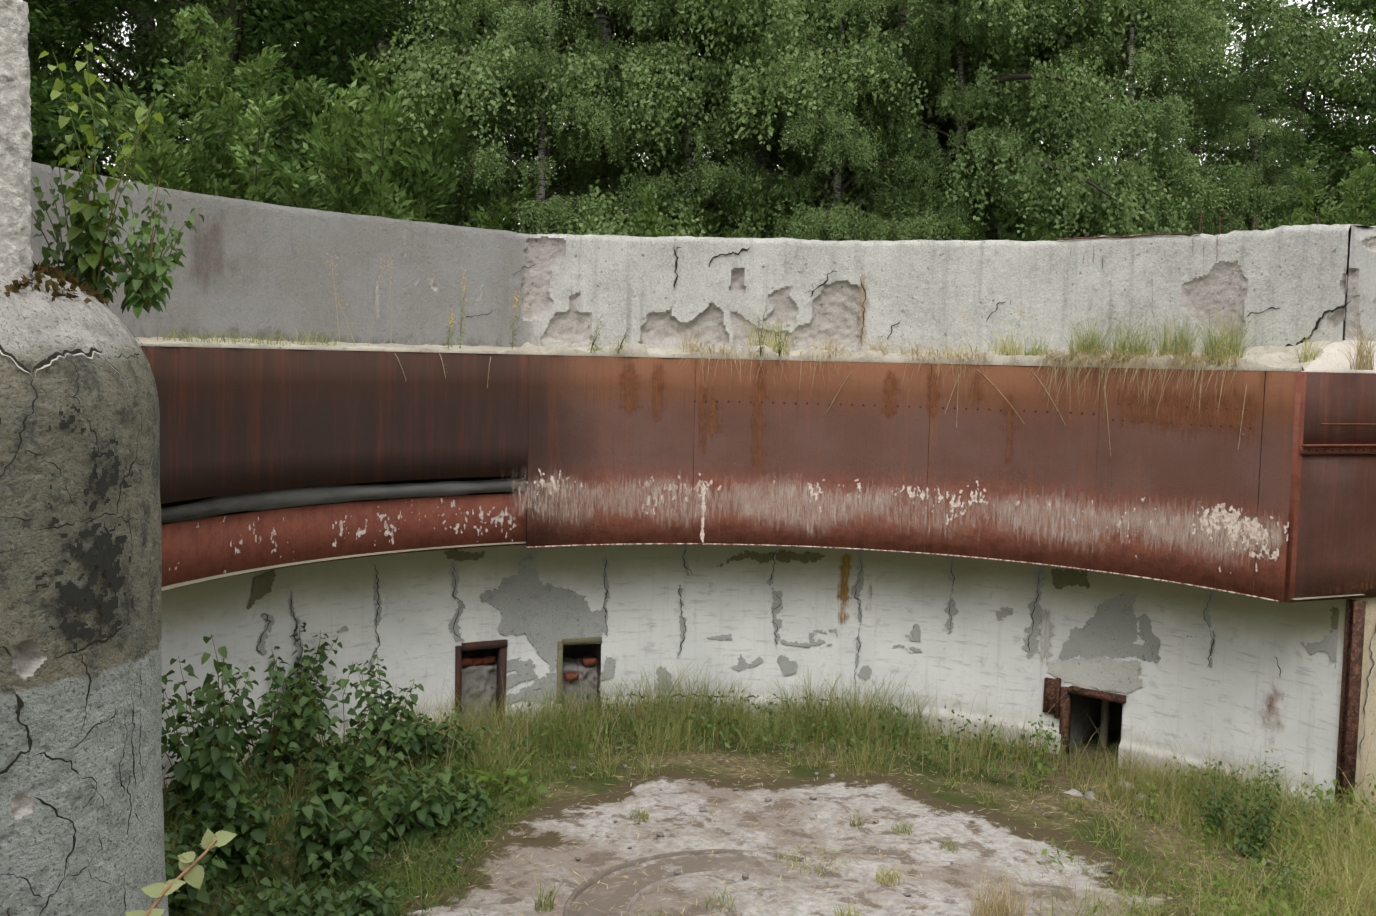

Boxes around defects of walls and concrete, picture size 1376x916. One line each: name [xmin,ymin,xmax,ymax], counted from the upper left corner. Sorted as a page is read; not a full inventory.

spalling [519,236,594,346]
spalling [638,268,863,350]
spalling [1180,260,1248,339]
rust [140,346,1376,622]
crack [0,327,150,916]
peeling [480,550,616,704]
peeling [1051,568,1090,589]
peeling [1059,593,1161,663]
crack [1360,626,1376,761]